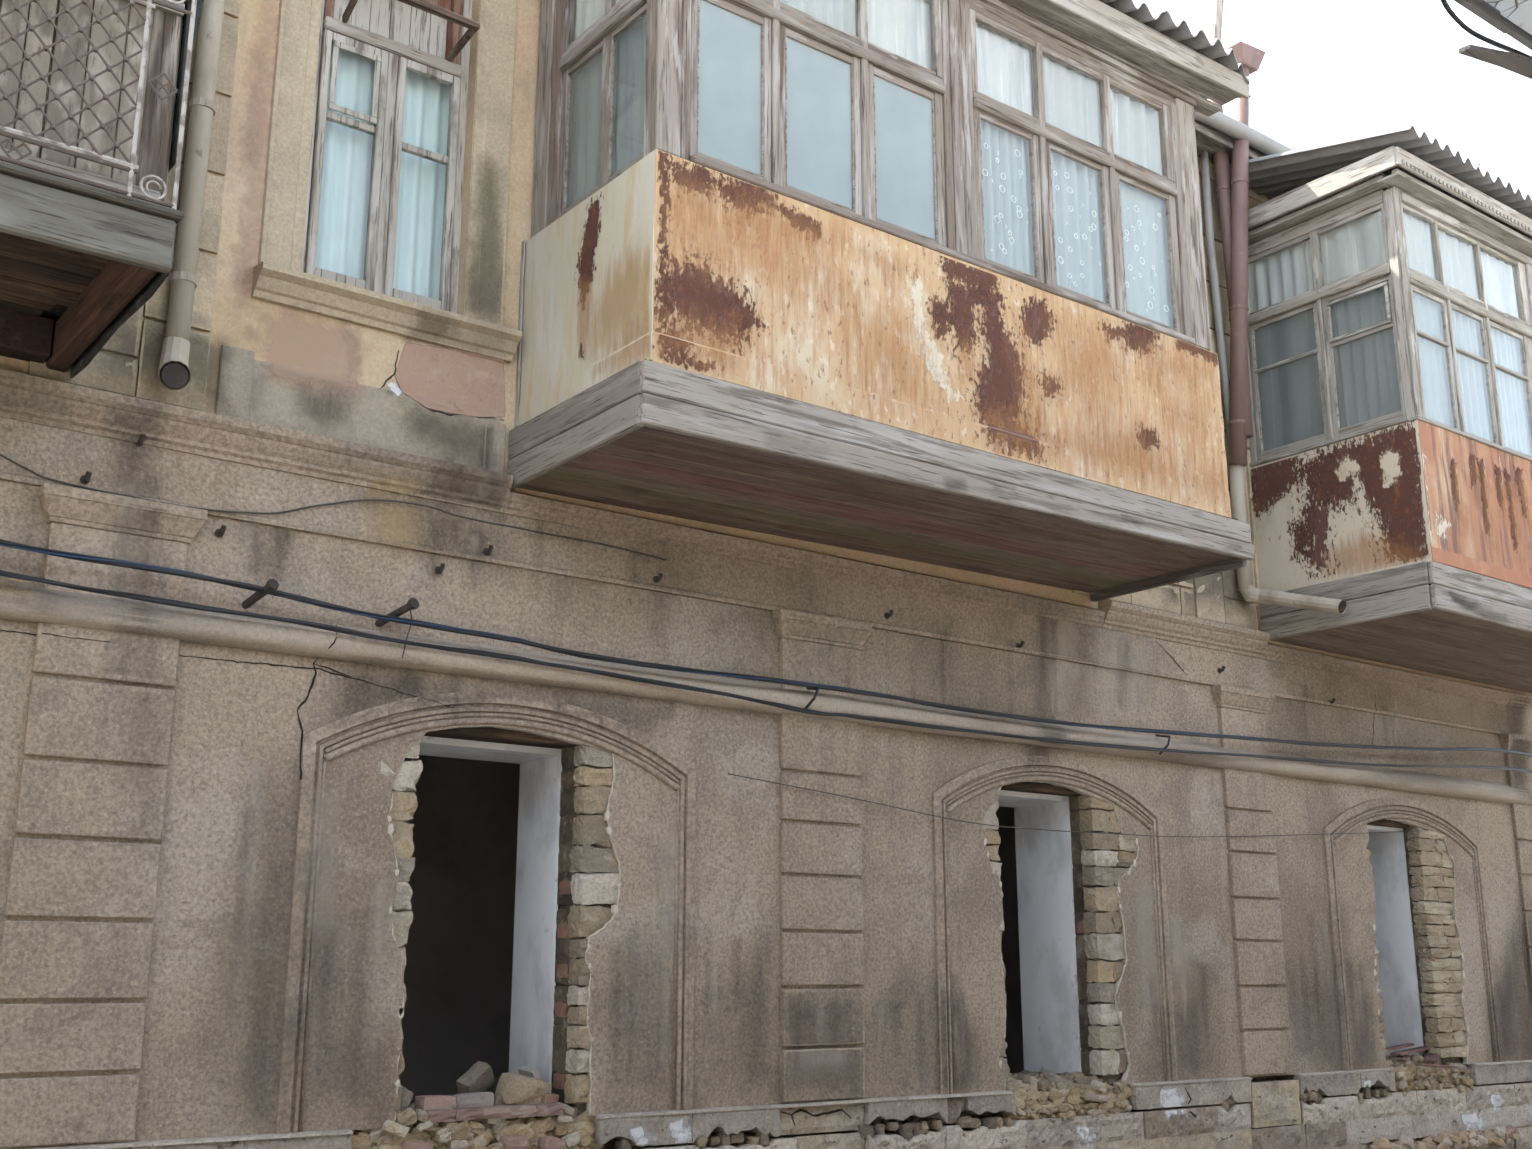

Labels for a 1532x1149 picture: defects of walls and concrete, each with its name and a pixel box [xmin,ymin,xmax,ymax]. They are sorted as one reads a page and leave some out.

rust [574,191,604,311]
rust [652,150,822,374]
rust [910,256,1063,463]
rust [1251,420,1529,580]
crack [179,625,457,780]
flaking render [351,735,621,1149]
flaking render [982,786,1003,898]
flaking render [994,795,1139,1149]
flaking render [1372,825,1475,1096]